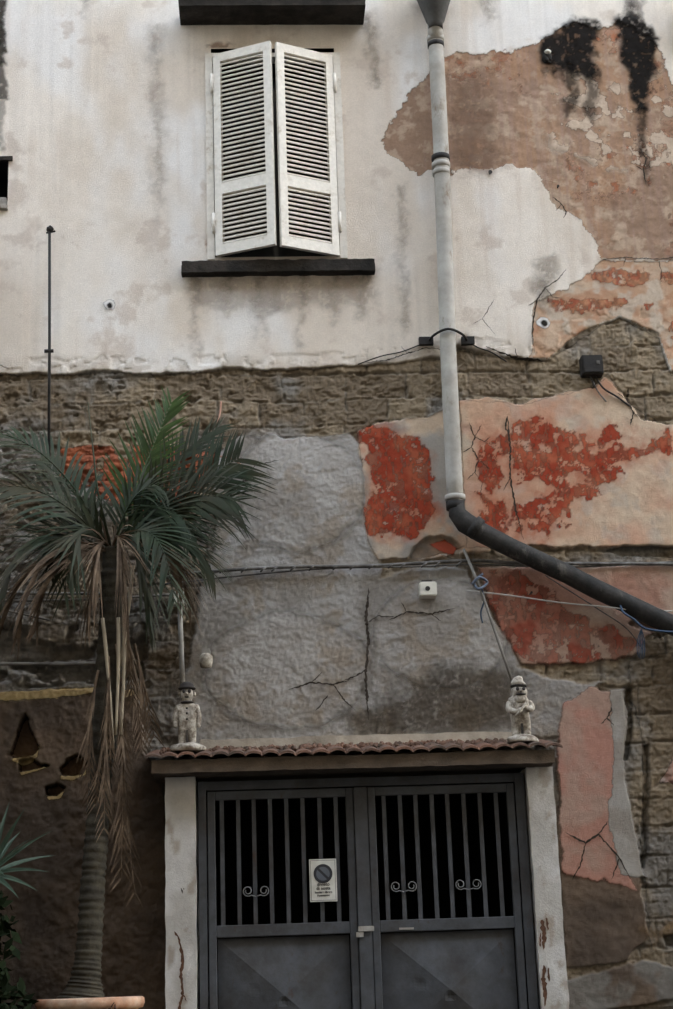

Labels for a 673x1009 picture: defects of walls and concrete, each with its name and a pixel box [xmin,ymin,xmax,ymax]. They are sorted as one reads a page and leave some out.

peeling [381,71,433,176]
leakage [539,18,601,117]
leakage [614,2,659,156]
peeling [444,22,673,614]
spalling [0,359,489,630]
crack [567,822,630,881]